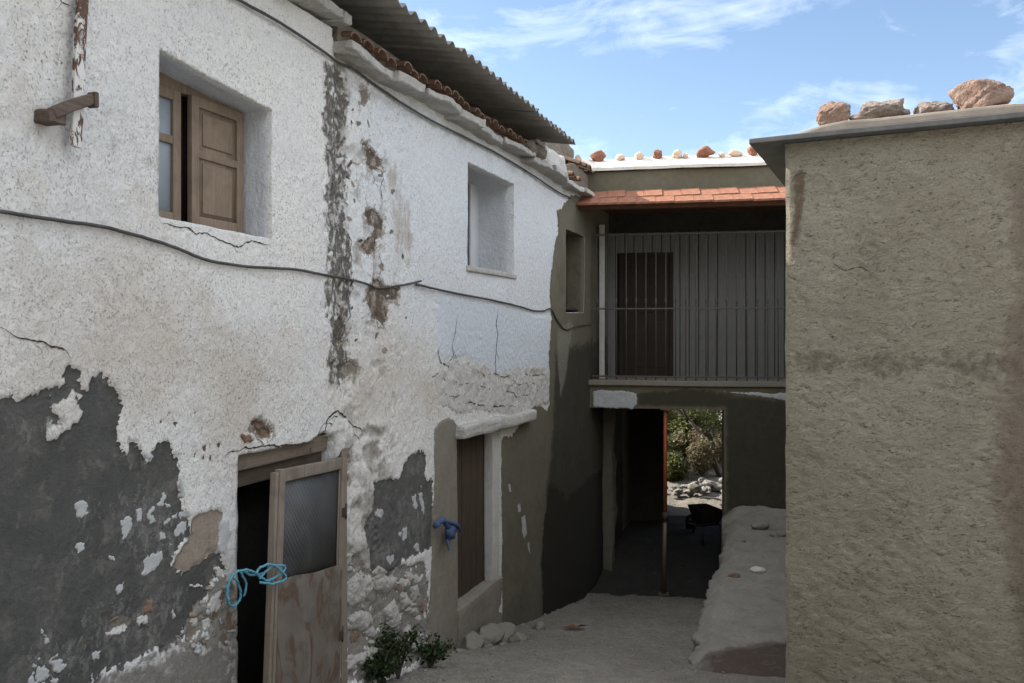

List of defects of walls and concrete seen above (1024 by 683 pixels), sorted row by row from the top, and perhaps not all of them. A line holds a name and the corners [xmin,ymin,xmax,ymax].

crack [164,223,266,253]
spalling [326,206,401,379]
crack [0,327,70,359]
crack [433,315,544,407]
spalling [435,358,550,414]
spalling [241,416,276,443]
crack [224,410,362,457]
peeling [0,365,238,683]
spalling [345,450,433,683]